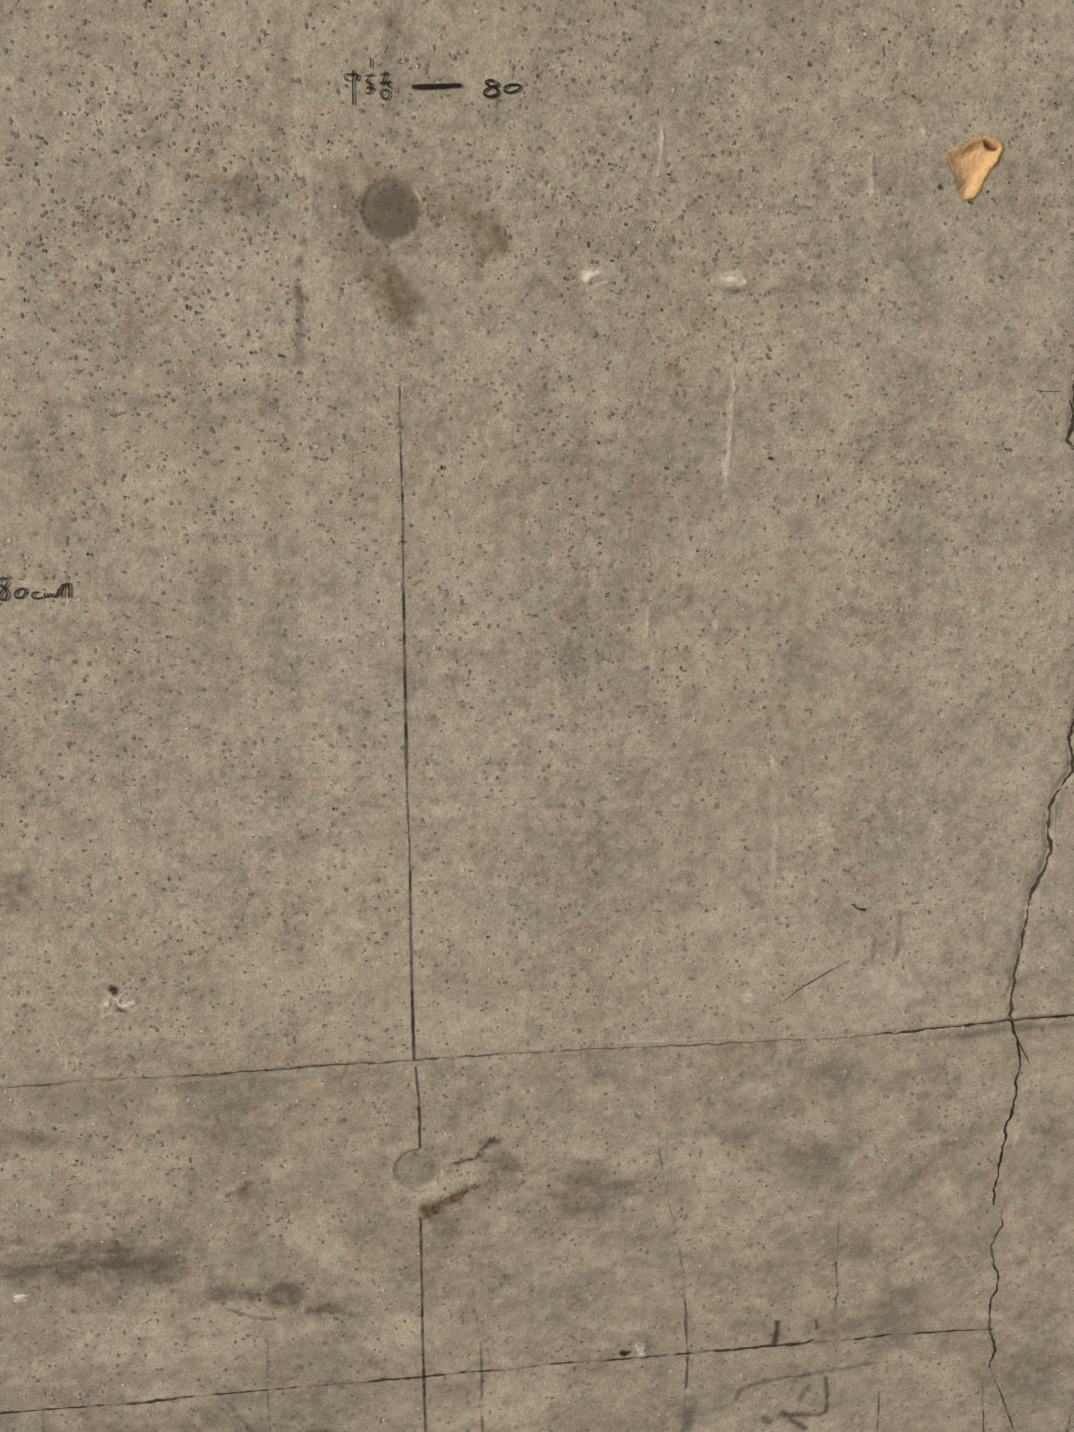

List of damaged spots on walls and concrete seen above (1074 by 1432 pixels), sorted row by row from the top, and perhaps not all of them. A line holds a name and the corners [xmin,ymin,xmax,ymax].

crack [1056,381,1074,450]
crack [982,719,1074,1432]
corrosion [421,1186,472,1217]